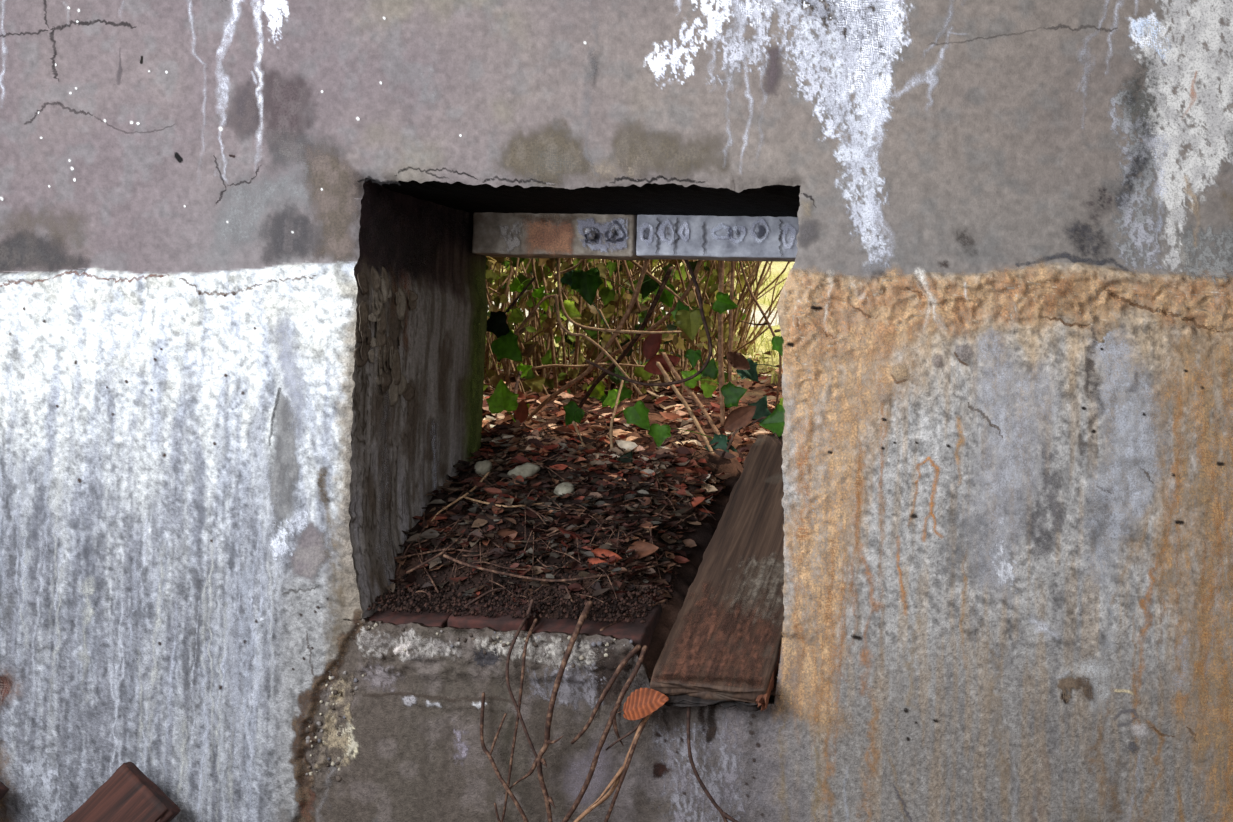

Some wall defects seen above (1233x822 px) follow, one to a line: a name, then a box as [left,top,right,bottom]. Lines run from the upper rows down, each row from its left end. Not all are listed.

leakage [0,214,84,272]
crack [1,0,135,124]
crack [214,156,261,203]
leakage [218,0,473,278]
leakage [645,0,943,277]
crack [1045,24,1116,32]
leakage [1016,0,1233,285]
rust [777,266,1233,822]
leakage [187,509,308,757]
spalling [305,623,633,788]
leakage [17,755,63,822]